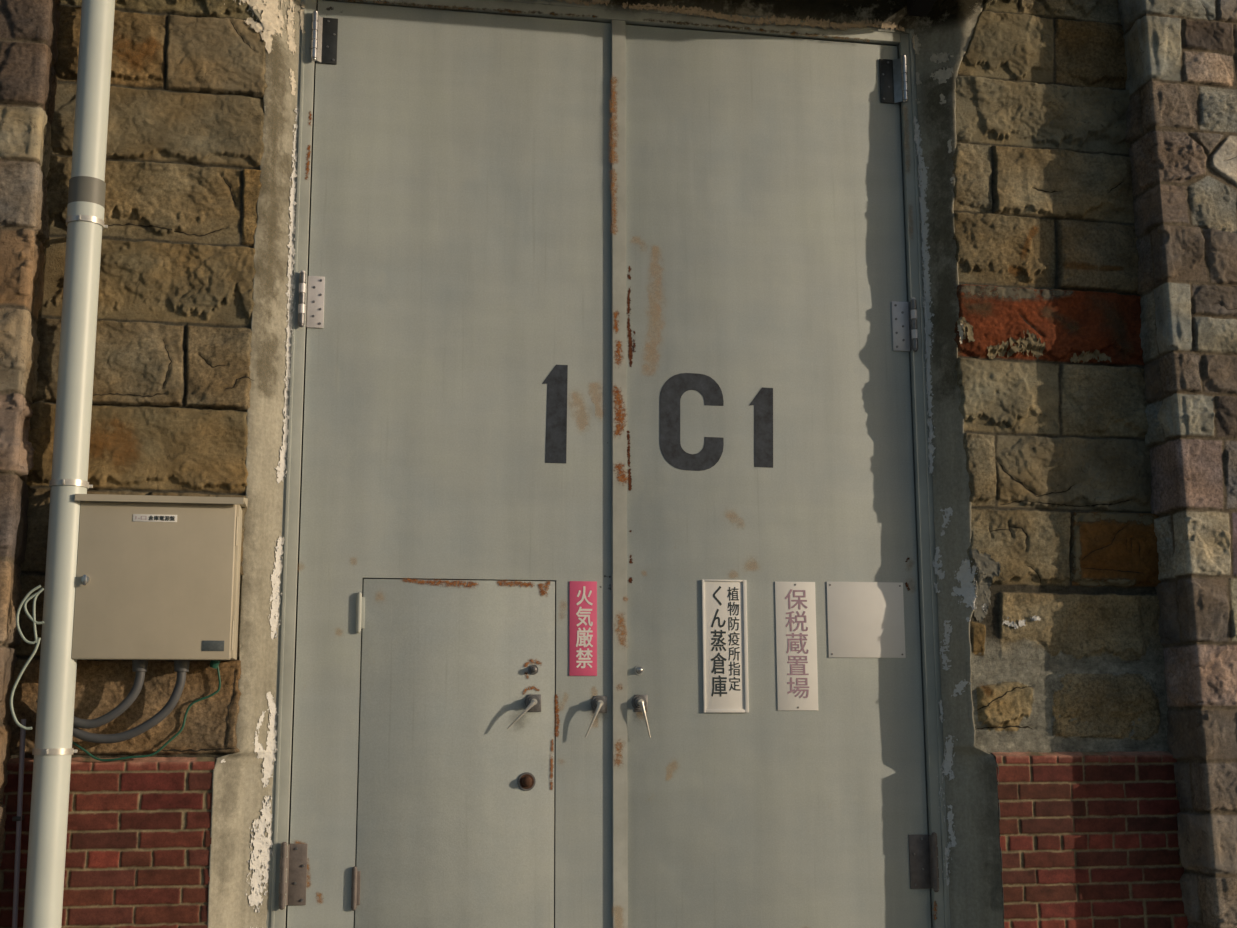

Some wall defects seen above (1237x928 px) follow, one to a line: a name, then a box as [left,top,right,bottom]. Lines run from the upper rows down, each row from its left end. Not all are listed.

peeling [224,0,306,483]
peeling [622,2,954,476]
corrosion [613,266,636,367]
spalling [957,316,1045,359]
corrosion [613,387,632,491]
corrosion [403,578,478,587]
corrosion [497,580,550,596]
peeling [932,507,1001,622]
peeling [1003,615,1041,629]
peeling [246,692,279,928]
corrosion [550,695,560,790]
peeling [937,679,971,886]